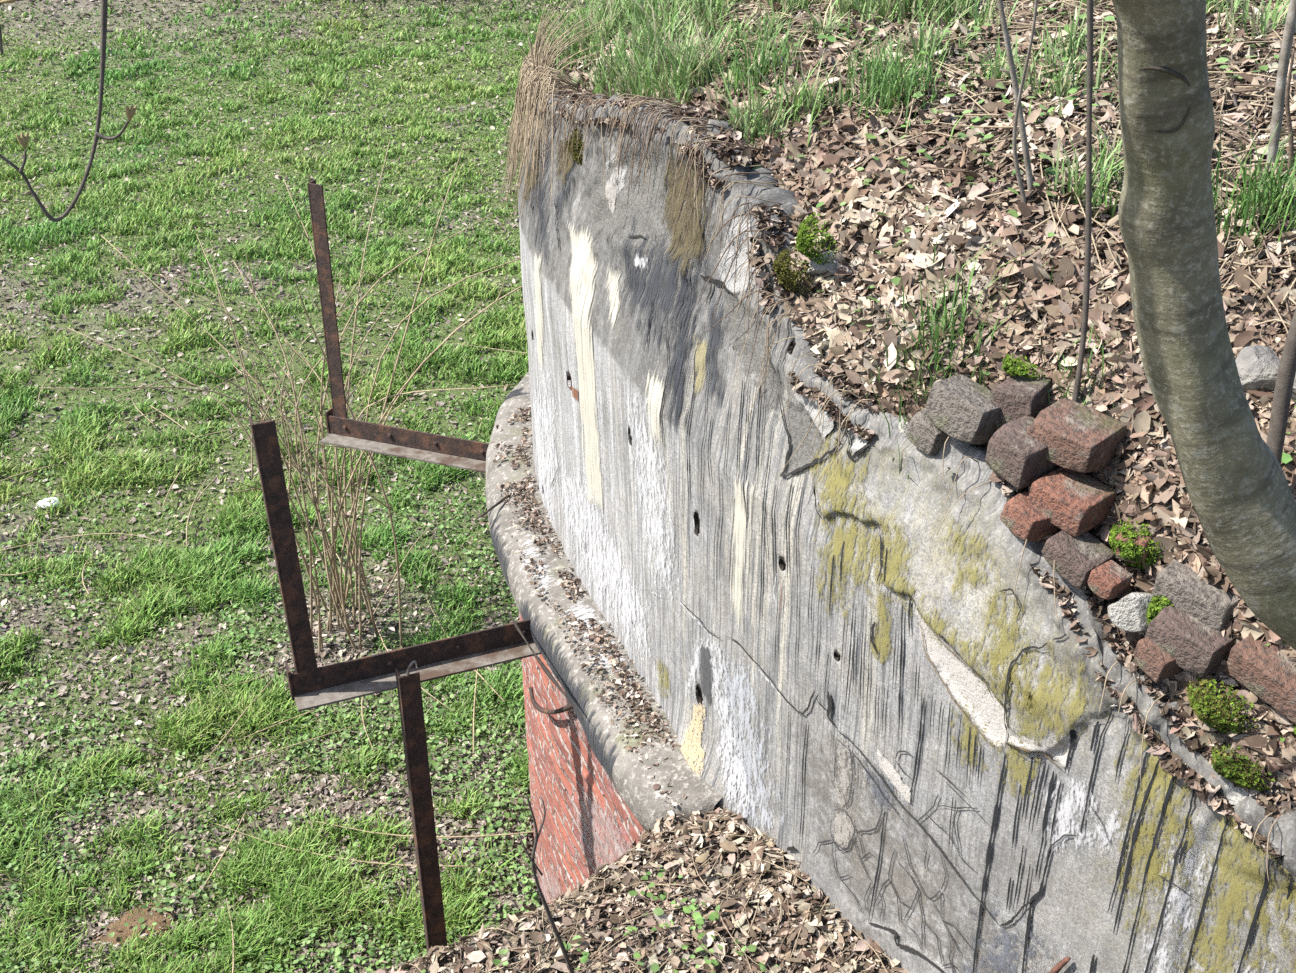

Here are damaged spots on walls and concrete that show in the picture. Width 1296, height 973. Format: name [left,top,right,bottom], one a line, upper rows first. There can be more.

crack [875,528,883,581]
damp [520,135,1296,973]
spalling [913,603,1122,770]
crack [652,588,1034,973]
crack [1044,807,1111,863]